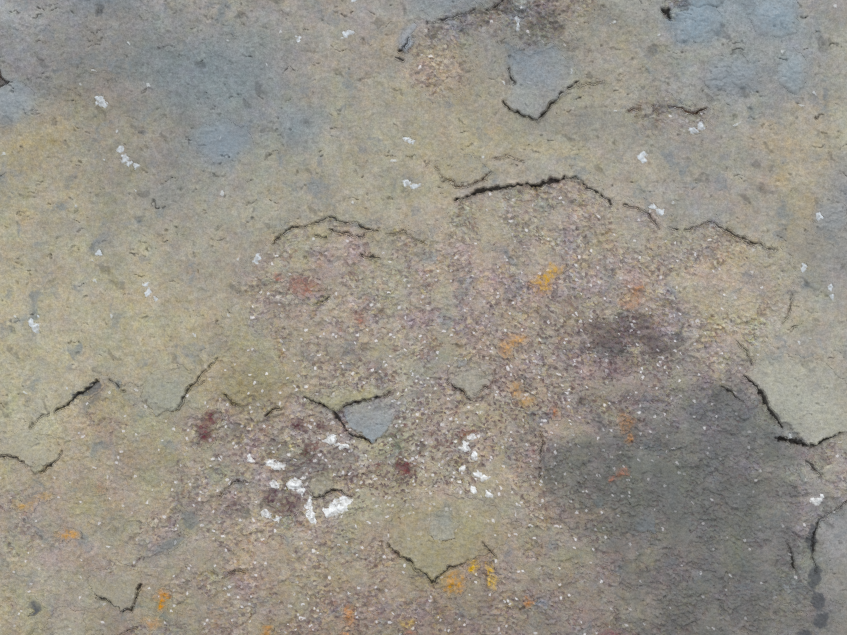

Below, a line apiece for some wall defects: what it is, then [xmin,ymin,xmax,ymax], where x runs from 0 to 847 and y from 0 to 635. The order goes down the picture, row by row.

crack [502,66,605,122]
peeling [435,153,491,186]
crack [434,152,778,252]
crack [271,216,426,259]
corrosion [527,260,567,297]
crack [29,379,125,429]
crack [303,392,392,445]
spalling [0,172,847,635]
crack [718,340,846,477]
crack [0,450,63,474]
crack [386,543,464,585]
corrosion [439,558,500,597]